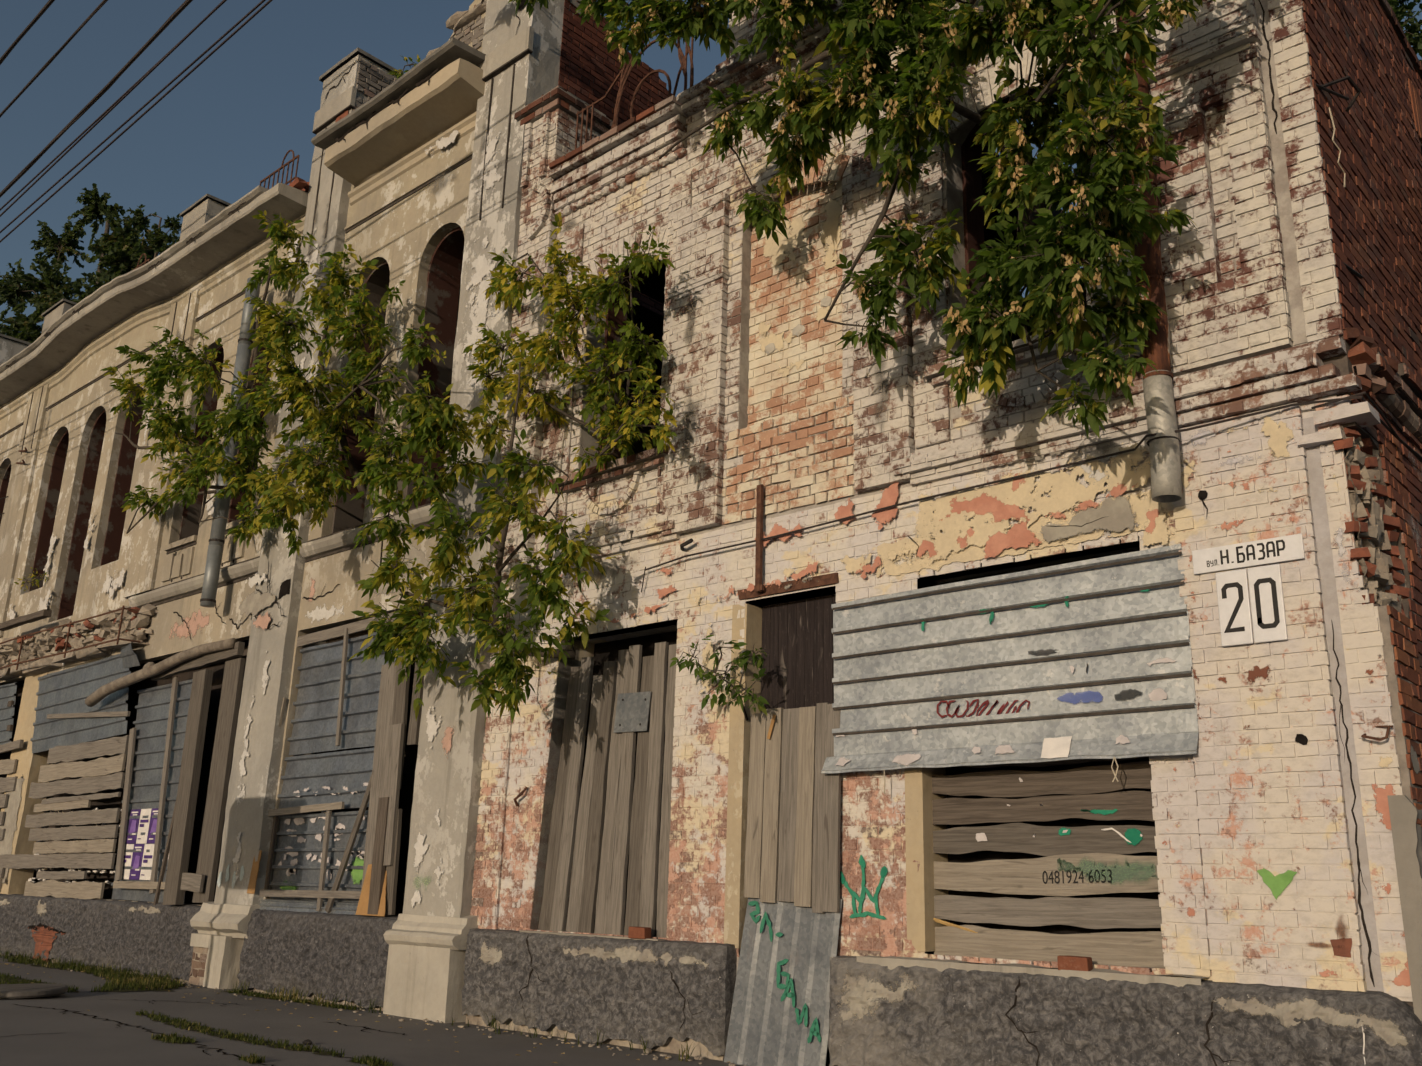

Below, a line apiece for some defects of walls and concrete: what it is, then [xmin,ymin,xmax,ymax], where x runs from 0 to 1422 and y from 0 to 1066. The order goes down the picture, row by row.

crack [1258,0,1278,134]
crack [173,563,340,639]
peeling [1078,465,1113,485]
spalling [1333,426,1410,616]
peeling [232,650,270,880]
crack [1331,620,1380,987]